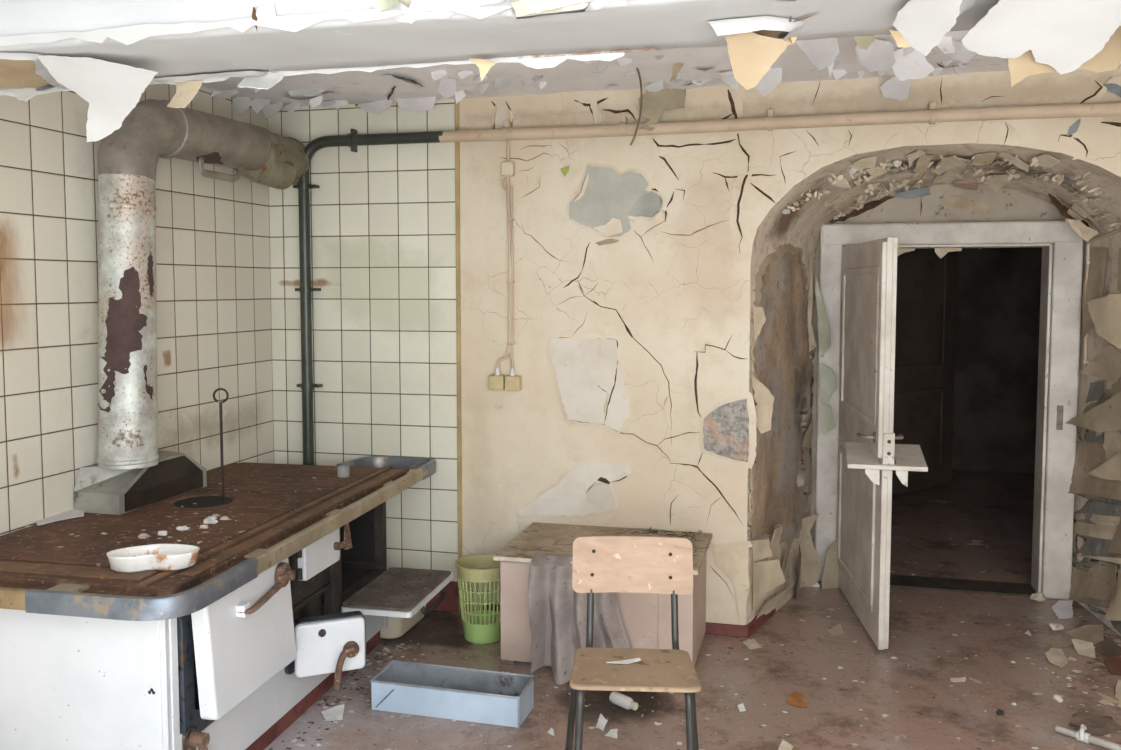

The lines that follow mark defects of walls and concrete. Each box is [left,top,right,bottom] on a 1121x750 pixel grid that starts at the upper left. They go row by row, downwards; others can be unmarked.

peeling [0,0,632,142]
crack [381,75,426,101]
crack [574,68,852,263]
crack [829,193,922,223]
peeling [638,0,1121,131]
peeling [782,150,1121,349]
crack [1048,193,1089,227]
crack [1058,75,1121,160]
peeling [544,333,635,433]
crack [491,101,752,594]
spalling [698,243,839,619]
spalling [1066,377,1121,634]